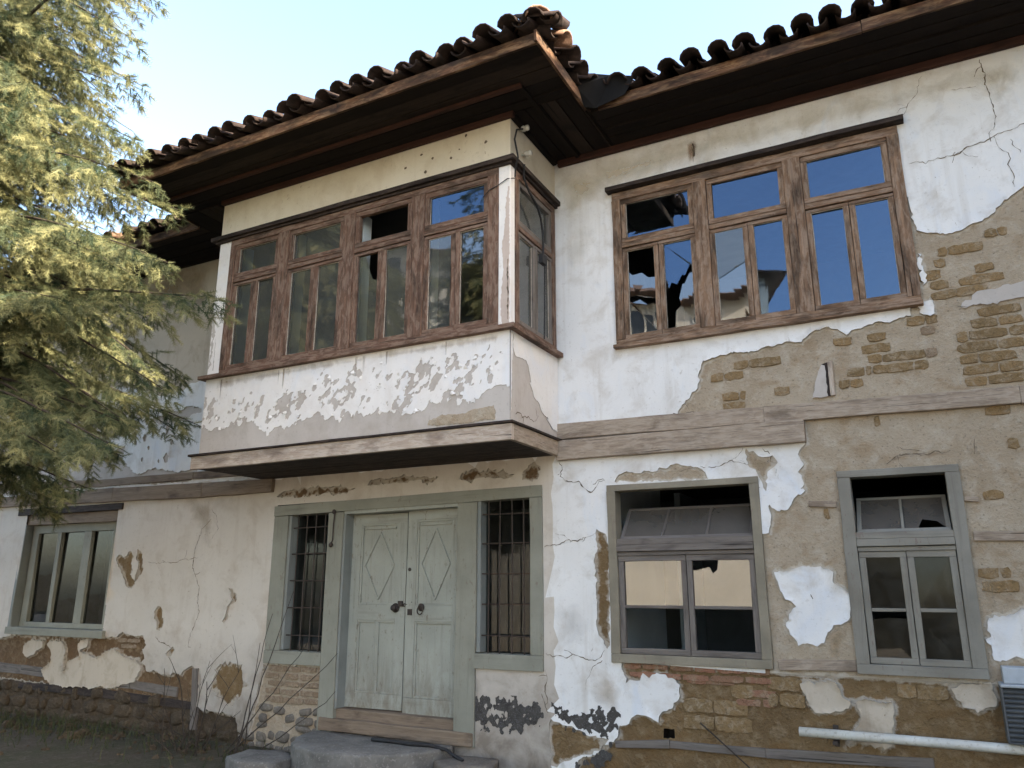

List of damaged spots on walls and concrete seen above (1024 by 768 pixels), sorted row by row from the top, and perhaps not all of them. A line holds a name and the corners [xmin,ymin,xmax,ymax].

crack [910,60,1024,184]
peeling [36,186,557,490]
spalling [678,186,1024,413]
peeling [277,474,438,498]
spalling [116,549,143,588]
spalling [154,606,164,630]
crack [150,510,218,648]
spalling [475,404,1024,768]
spalling [0,628,320,752]